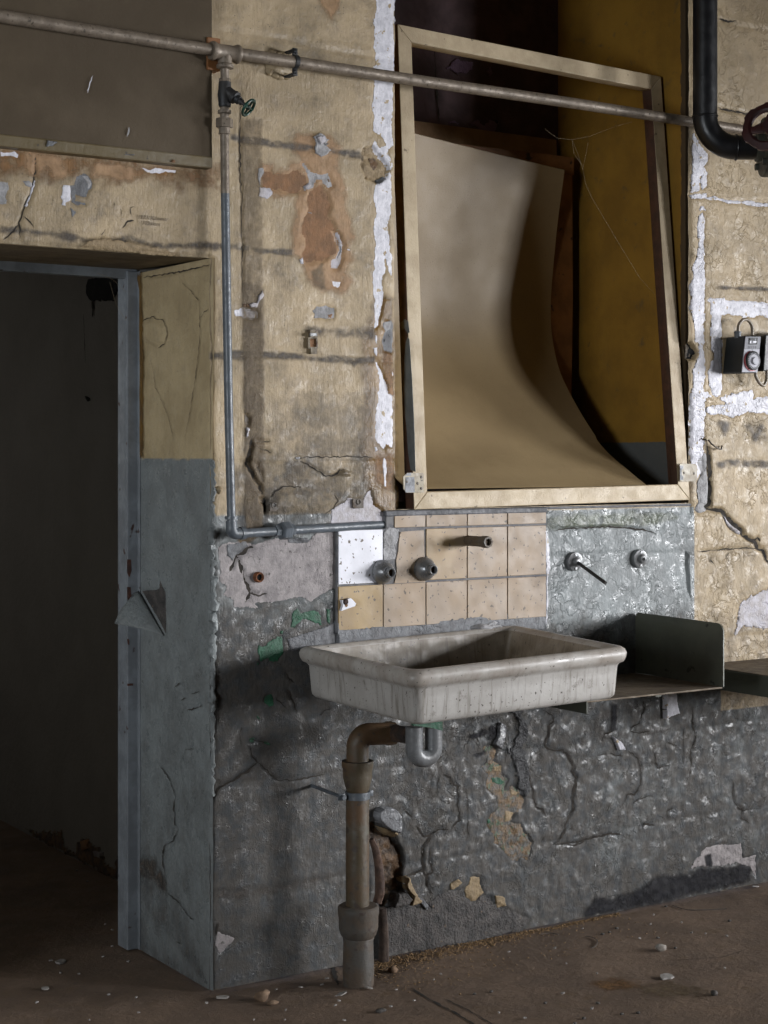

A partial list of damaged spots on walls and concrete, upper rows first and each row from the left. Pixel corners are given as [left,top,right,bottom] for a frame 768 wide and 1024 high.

crack [3,157,36,240]
flaking render [257,163,350,268]
peeling [360,0,396,486]
peeling [684,133,768,513]
crack [244,436,371,494]
crack [699,438,768,564]
flaking render [218,490,384,665]
crack [213,727,324,800]
crack [403,774,469,895]
flaking render [369,806,529,953]
crack [528,701,696,846]
flaking render [691,843,759,887]